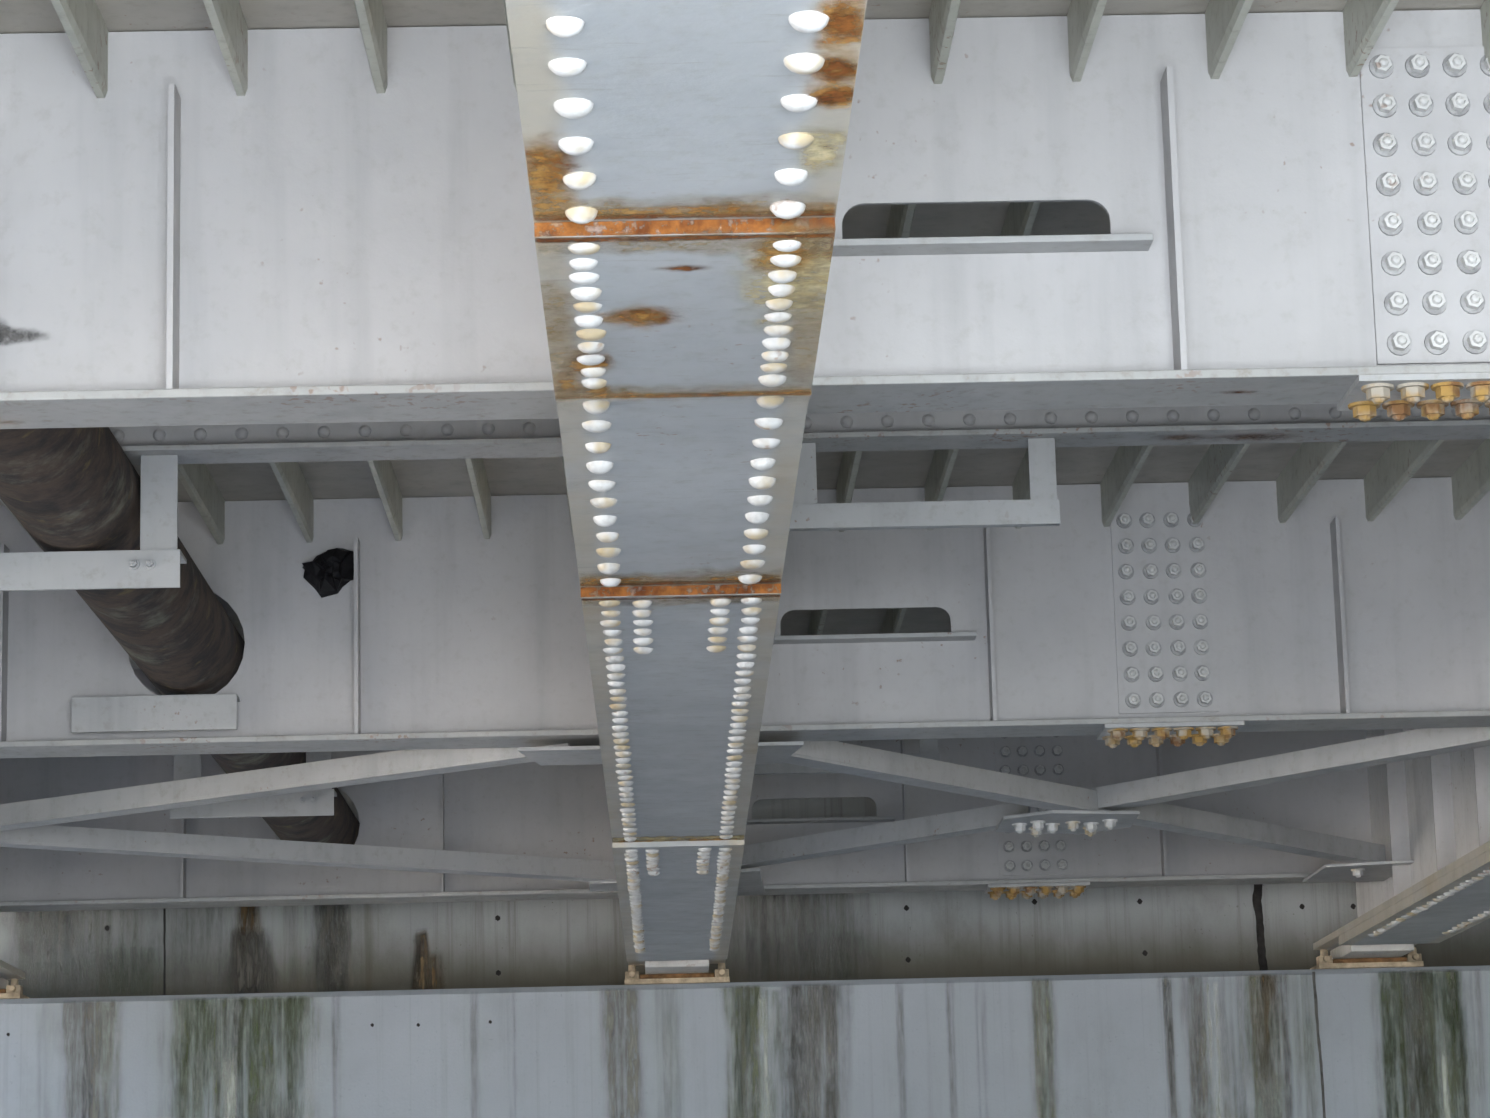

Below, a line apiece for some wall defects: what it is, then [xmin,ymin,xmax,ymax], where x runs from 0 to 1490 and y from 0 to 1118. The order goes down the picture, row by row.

corrosion [809,0,863,106]
corrosion [804,134,845,167]
corrosion [525,149,835,366]
corrosion [543,285,811,400]
corrosion [581,571,781,604]
water stain [317,904,346,989]
crack [1252,884,1268,971]
water stain [16,909,138,1118]
water stain [176,998,304,1118]
water stain [1379,971,1467,1118]